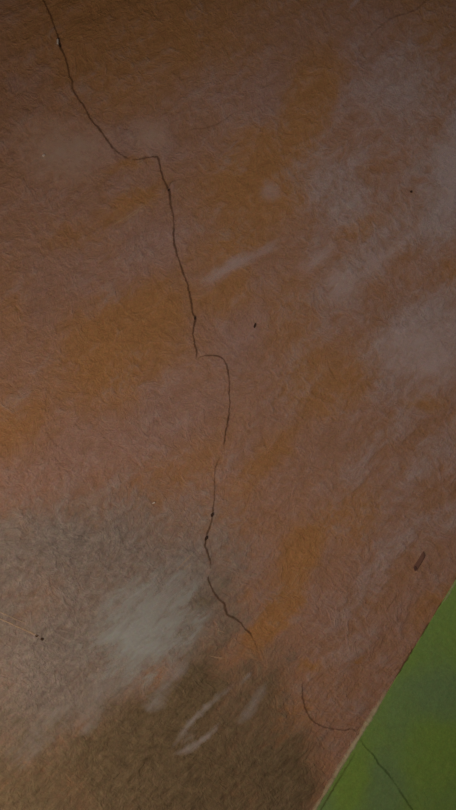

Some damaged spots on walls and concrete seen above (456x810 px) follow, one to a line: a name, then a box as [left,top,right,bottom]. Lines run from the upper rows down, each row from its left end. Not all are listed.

crack [44,2,108,141]
crack [173,231,228,370]